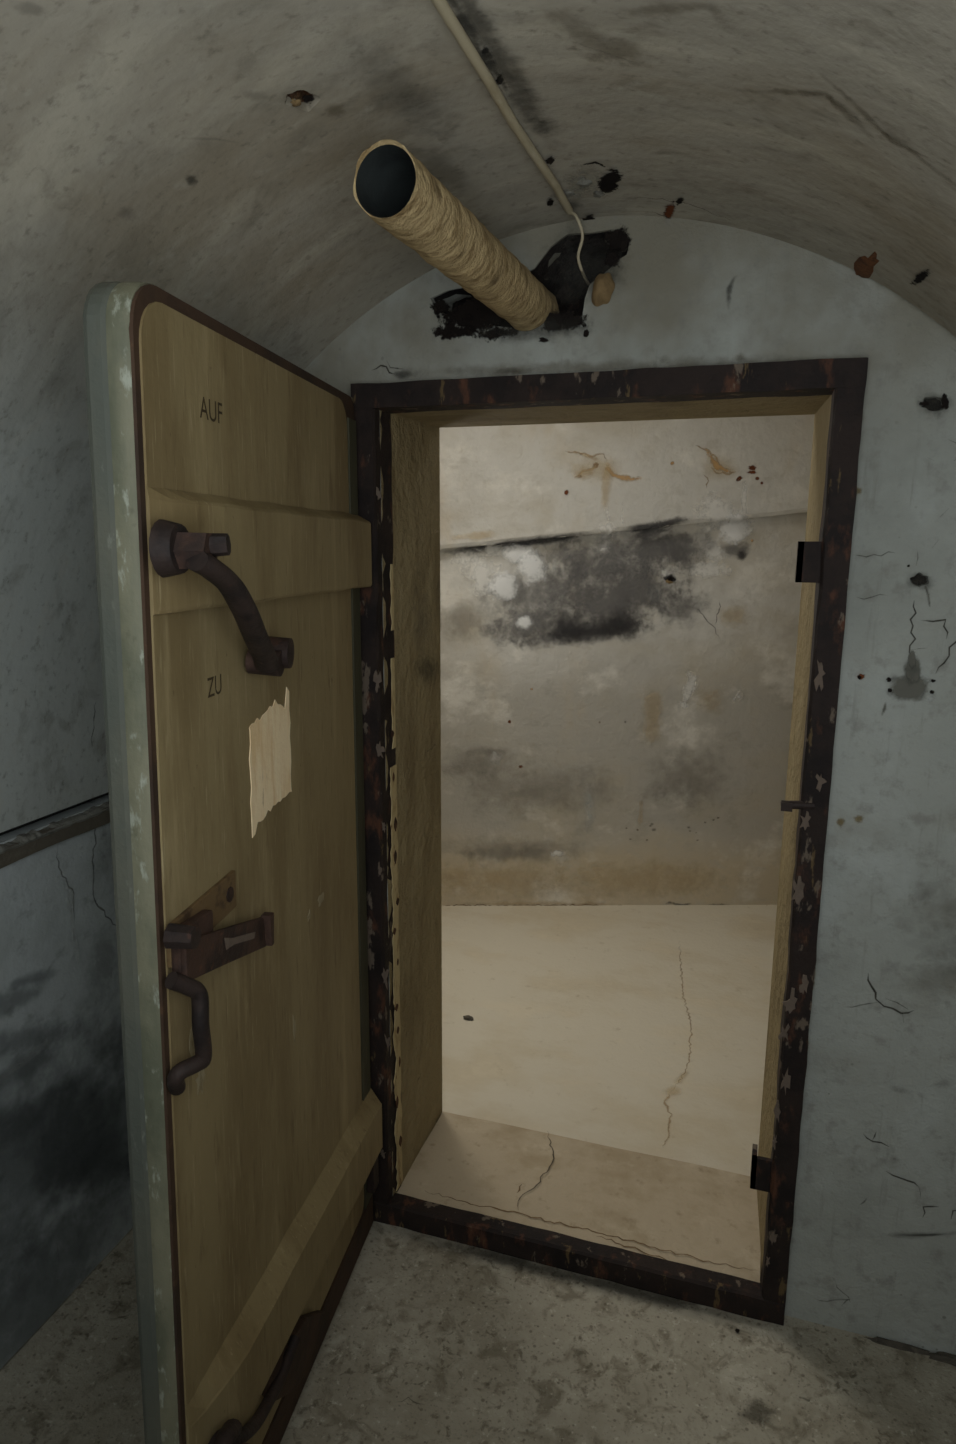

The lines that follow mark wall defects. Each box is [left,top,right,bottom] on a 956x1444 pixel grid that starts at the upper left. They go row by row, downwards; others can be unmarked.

spalling [530,161,628,317]
spalling [433,288,474,314]
rust [564,451,639,495]
rust [698,446,763,486]
damp [494,508,700,645]
crack [854,977,912,1014]
crack [664,952,692,1145]
crack [438,1134,739,1269]
crack [865,1133,956,1218]
spalling [864,1337,956,1366]